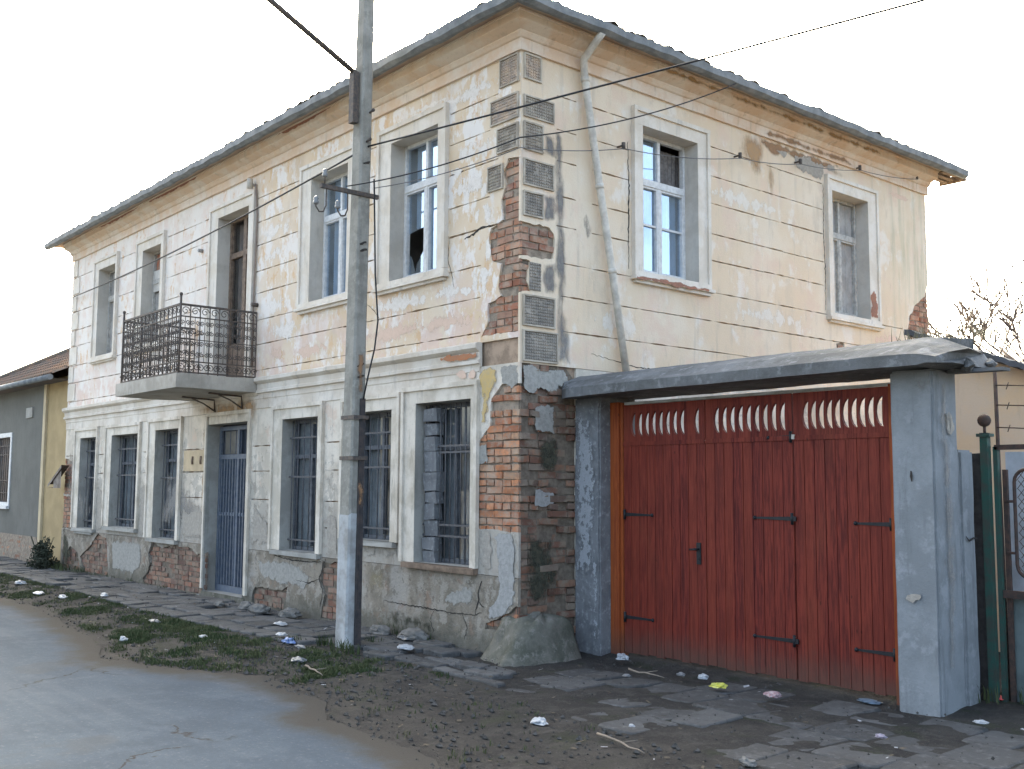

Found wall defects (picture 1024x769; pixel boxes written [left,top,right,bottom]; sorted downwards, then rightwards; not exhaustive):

spalling [777,150,835,180]
flaking render [366,139,554,343]
flaking render [907,292,929,339]
flaking render [62,485,208,594]
spalling [254,560,308,610]
flaking render [322,515,337,620]
crack [385,581,484,640]
flaking render [440,352,576,634]